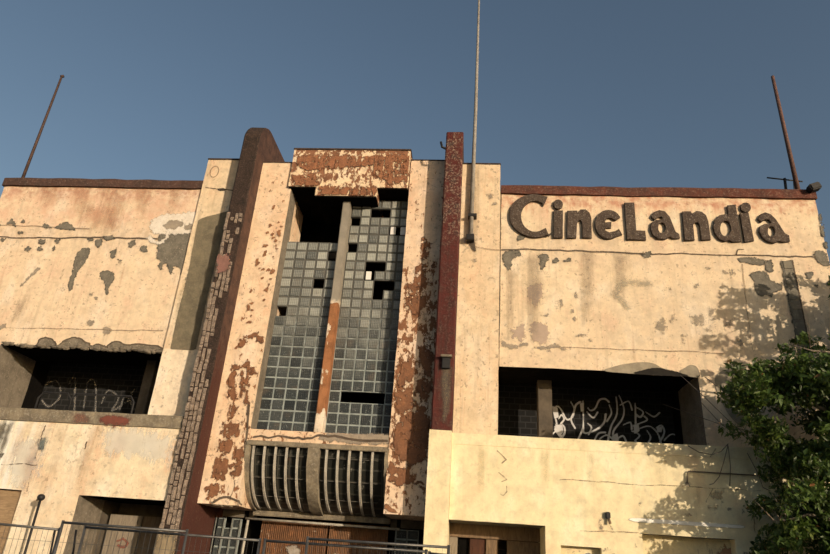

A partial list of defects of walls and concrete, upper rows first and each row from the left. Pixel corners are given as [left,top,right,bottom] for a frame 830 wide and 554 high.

peeling [292,153,409,195]
peeling [24,222,75,253]
peeling [68,235,115,291]
peeling [89,270,115,300]
peeling [149,211,196,235]
peeling [238,221,283,347]
peeling [403,236,437,315]
spalling [738,257,811,358]
spalling [814,214,830,267]
spalling [2,327,163,354]
water stain [0,423,11,452]
peeling [204,359,259,507]